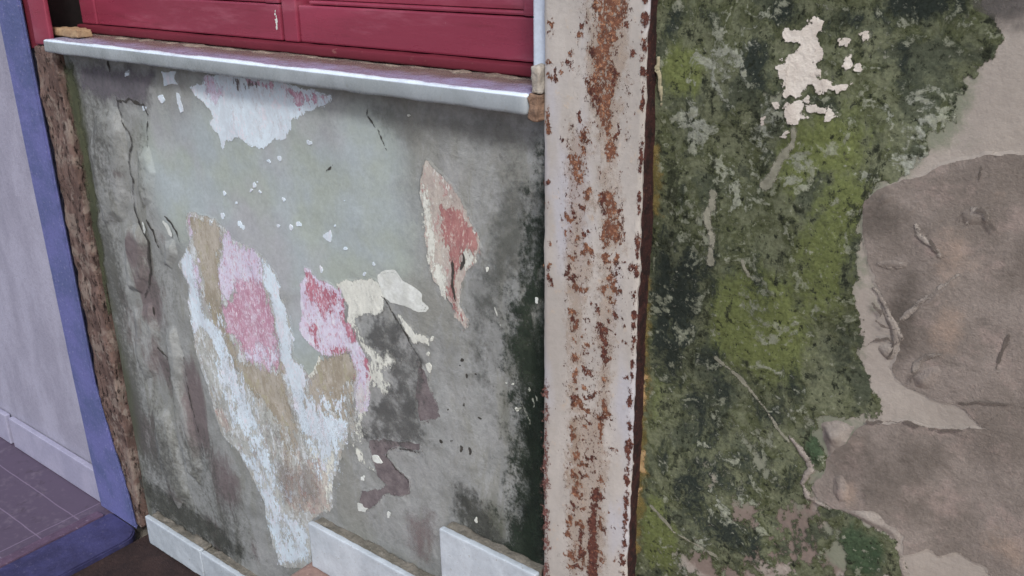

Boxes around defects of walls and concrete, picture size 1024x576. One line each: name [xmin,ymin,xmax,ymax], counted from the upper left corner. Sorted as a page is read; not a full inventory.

crack [116,98,178,316]
peeling [158,71,333,163]
peeling [418,156,489,331]
rust [540,0,662,576]
water stain [704,189,717,266]
water stain [760,128,796,190]
flaking render [760,16,871,138]
peeling [177,210,449,569]
water stain [714,356,789,442]
flaking render [811,150,1024,576]
mould [454,487,507,546]
water stain [650,505,717,557]